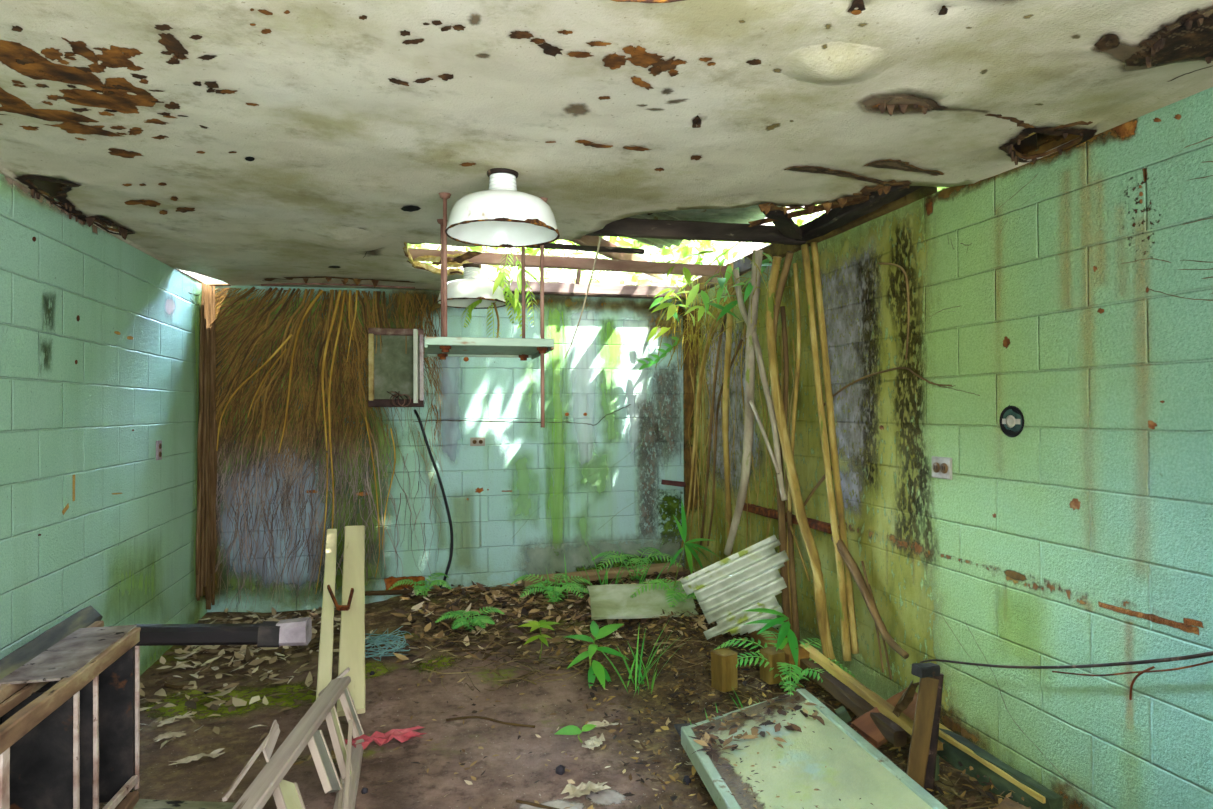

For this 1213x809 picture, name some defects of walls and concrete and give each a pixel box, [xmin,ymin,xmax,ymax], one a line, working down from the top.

mould [42,343,51,367]
mould [44,296,54,327]
mould [858,225,935,563]
corrosion [743,503,1204,635]